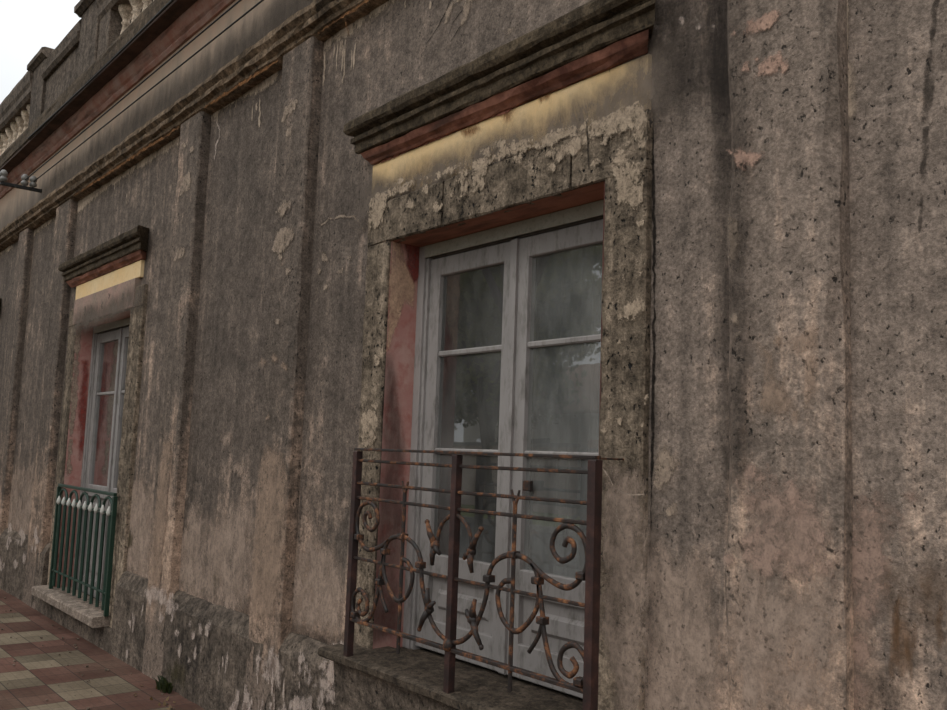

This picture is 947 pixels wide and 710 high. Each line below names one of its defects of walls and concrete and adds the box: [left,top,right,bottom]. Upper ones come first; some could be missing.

crack [426,0,463,44]
peeling [731,9,781,35]
peeling [742,51,788,76]
flaking render [321,100,648,234]
peeling [728,149,764,169]
crack [603,105,656,689]